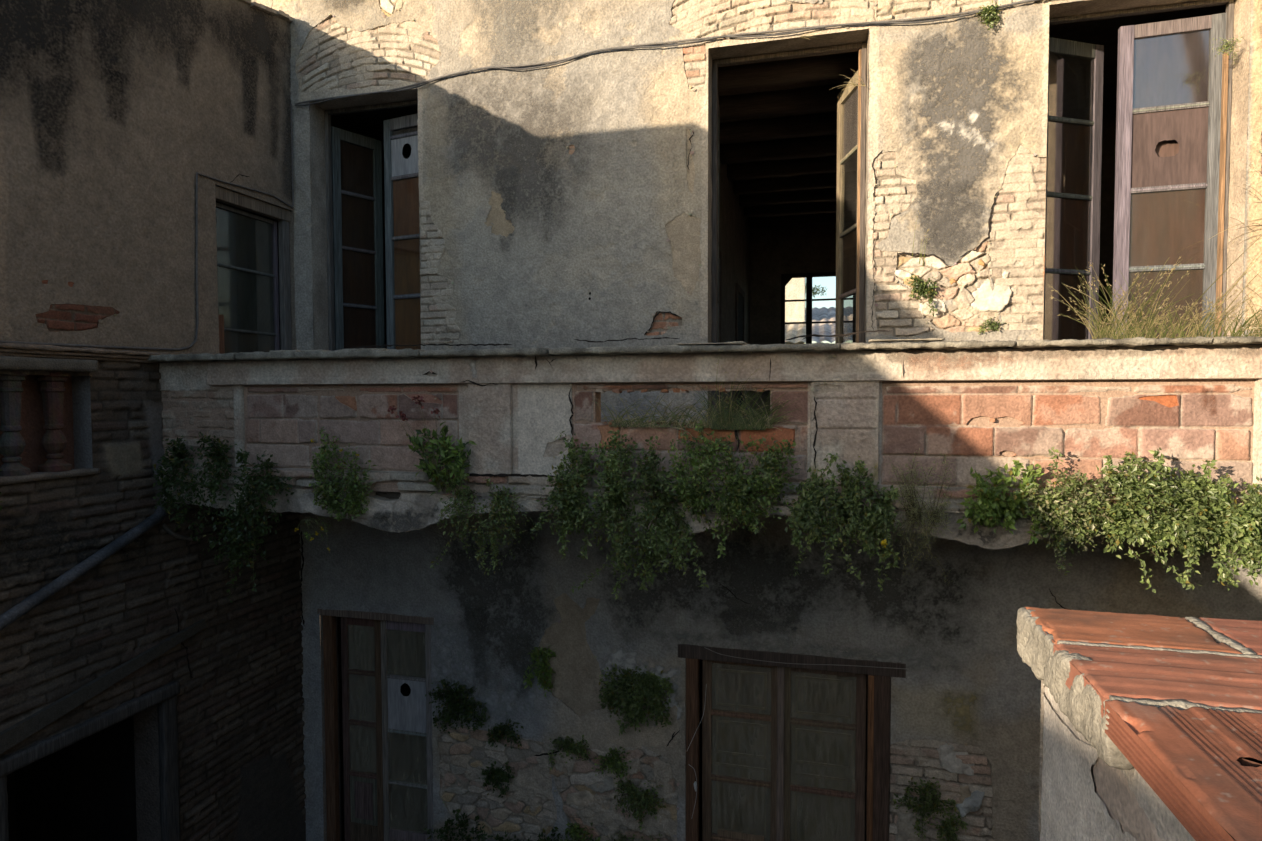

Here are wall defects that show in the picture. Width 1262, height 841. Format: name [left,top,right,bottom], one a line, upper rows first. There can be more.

damp [0,0,291,169]
flaking render [271,0,292,10]
damp [272,73,294,198]
flaking render [295,0,441,93]
damp [449,87,577,220]
flaking render [669,0,1063,91]
damp [904,17,1021,261]
flaking render [35,304,120,332]
flaking render [419,200,461,344]
flaking render [871,144,1046,337]
flaking render [437,593,680,841]
flaking render [889,739,994,841]